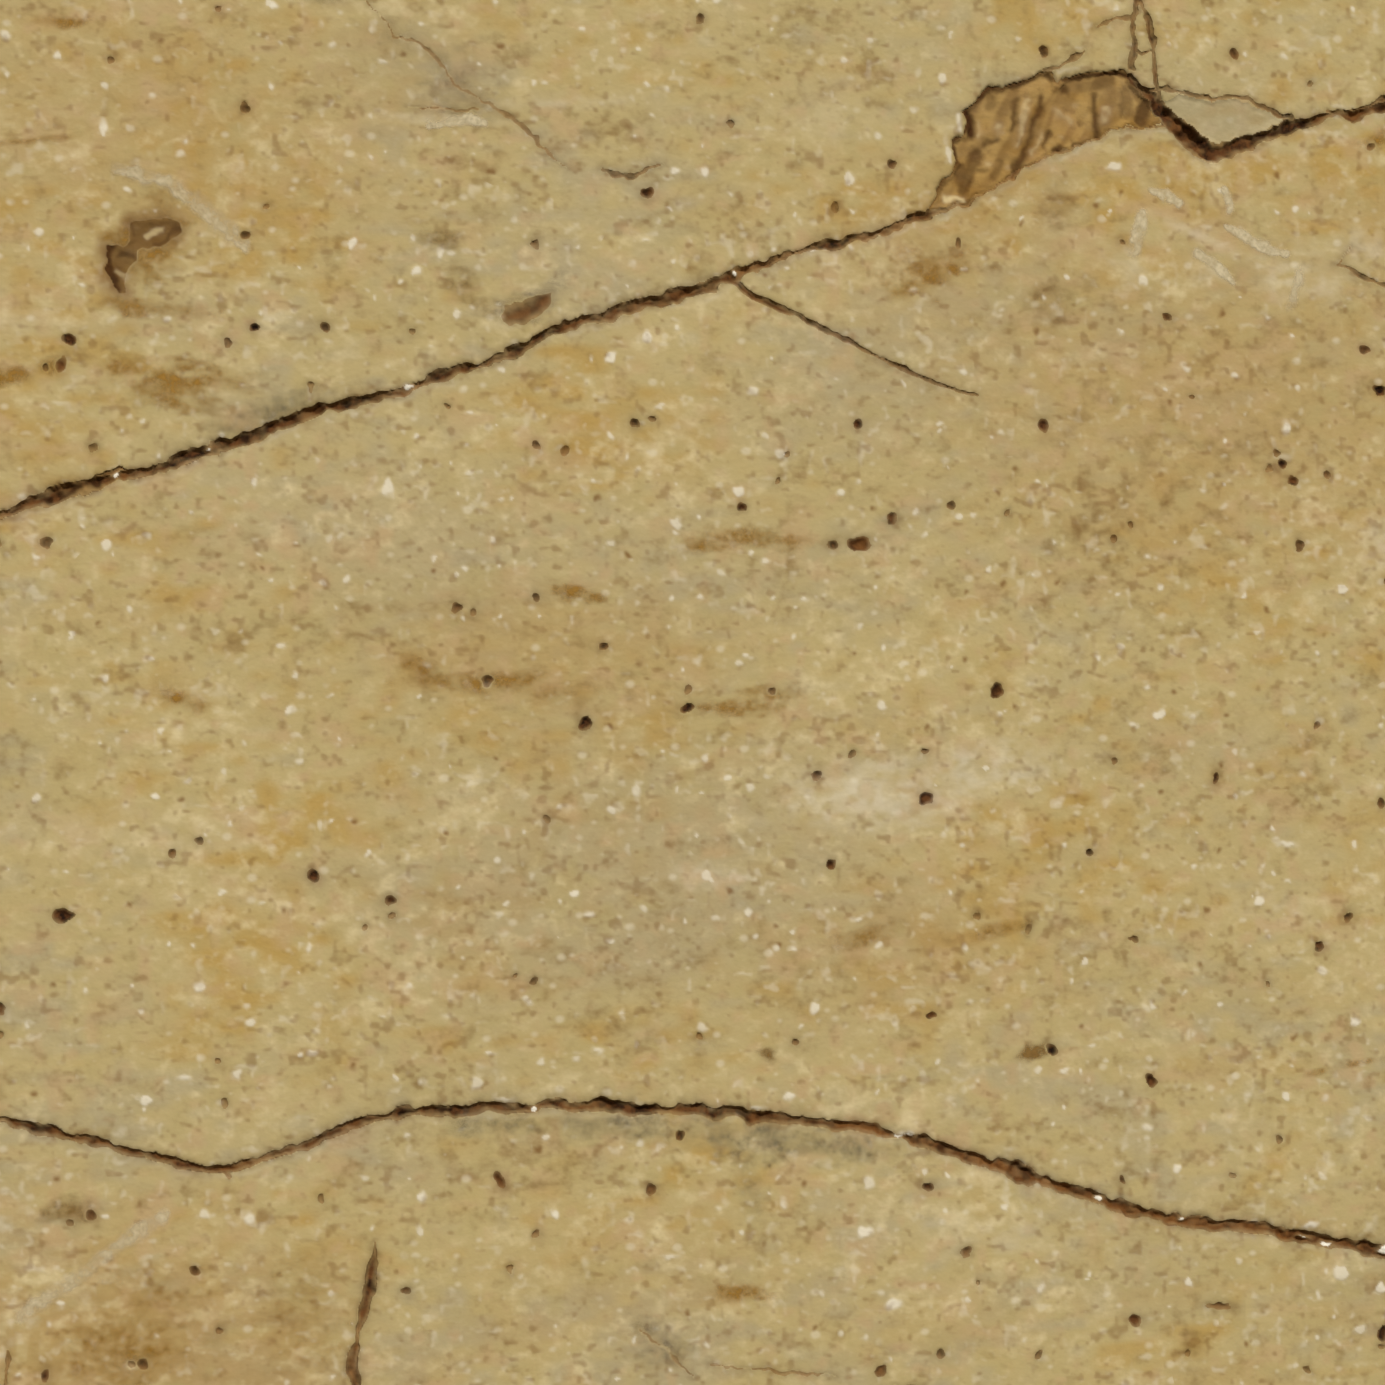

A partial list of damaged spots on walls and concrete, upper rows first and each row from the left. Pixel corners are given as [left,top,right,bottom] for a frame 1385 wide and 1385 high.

spalling [929,69,1283,209]
crack [0,0,1385,547]
crack [0,1096,1385,1259]
crack [345,1242,379,1385]